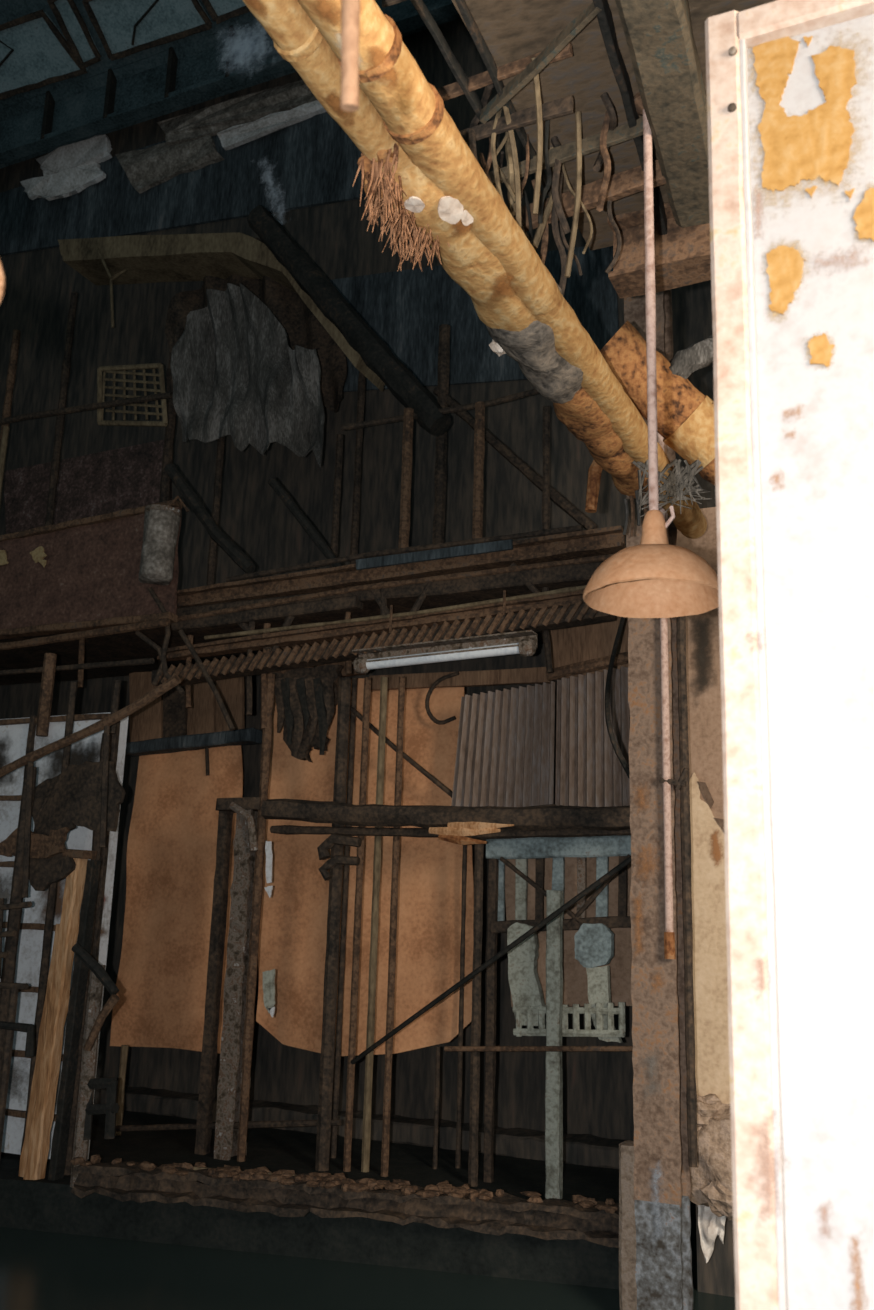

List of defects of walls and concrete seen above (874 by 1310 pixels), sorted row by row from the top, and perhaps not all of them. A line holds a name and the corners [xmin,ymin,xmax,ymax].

peeling [752,36,874,242]
peeling [766,242,806,317]
peeling [807,333,835,367]